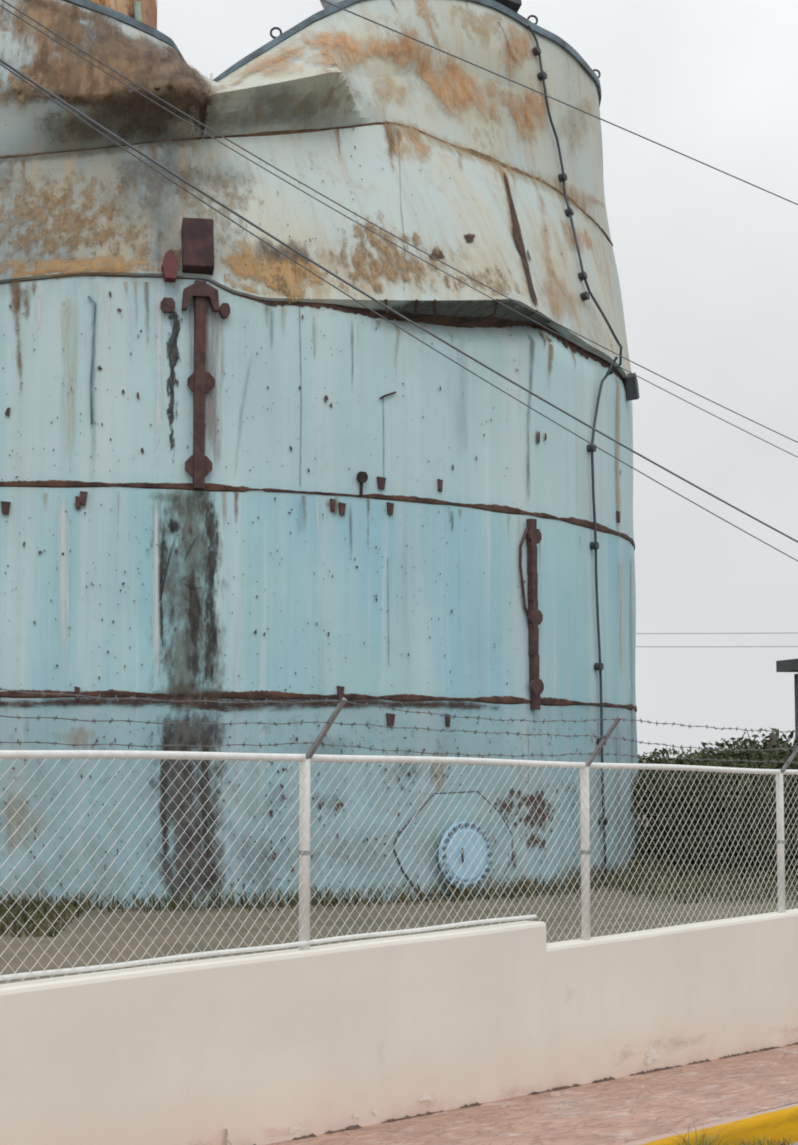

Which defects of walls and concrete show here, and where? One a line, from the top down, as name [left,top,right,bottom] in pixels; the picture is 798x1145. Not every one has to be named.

rust [303,30,546,139]
rust [0,159,160,330]
rust [385,120,595,247]
rust [224,215,625,511]
water stain [151,494,224,894]
rust [495,781,555,867]